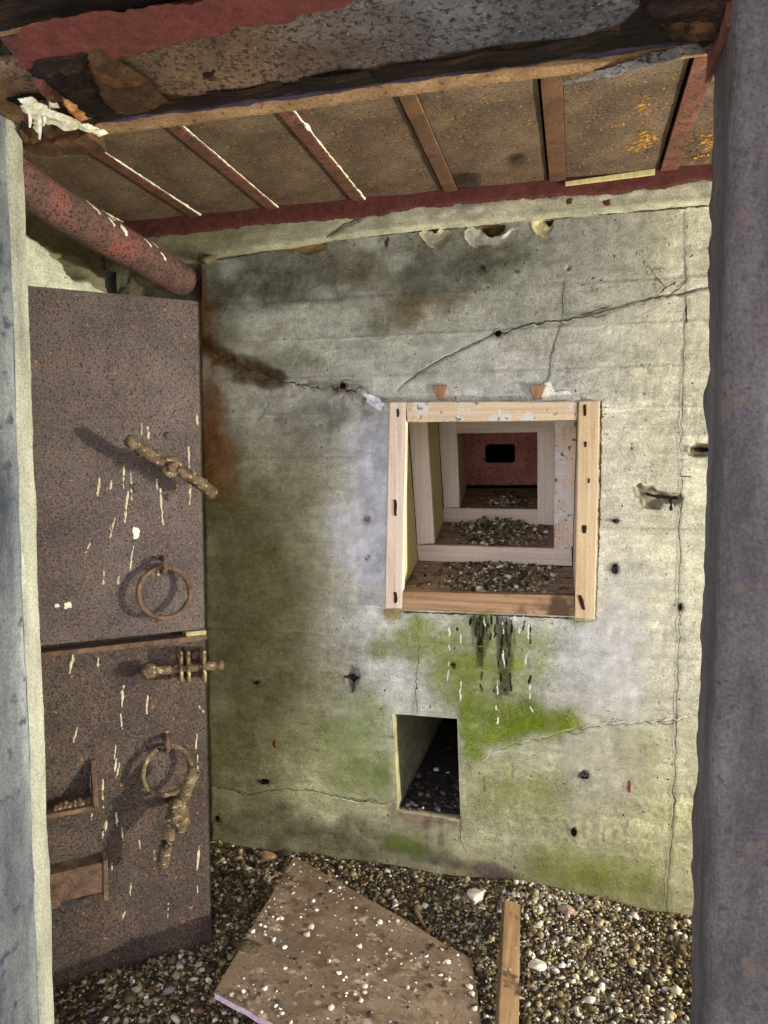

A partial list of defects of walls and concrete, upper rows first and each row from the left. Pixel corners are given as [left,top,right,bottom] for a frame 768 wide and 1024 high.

peeling [32,78,91,122]
rust [626,128,663,152]
peeling [122,164,713,238]
spalling [419,225,519,249]
rust [201,306,285,504]
crack [257,375,384,426]
spalling [635,483,684,511]
crack [404,220,709,911]
damp [447,615,533,724]
crack [217,788,391,804]